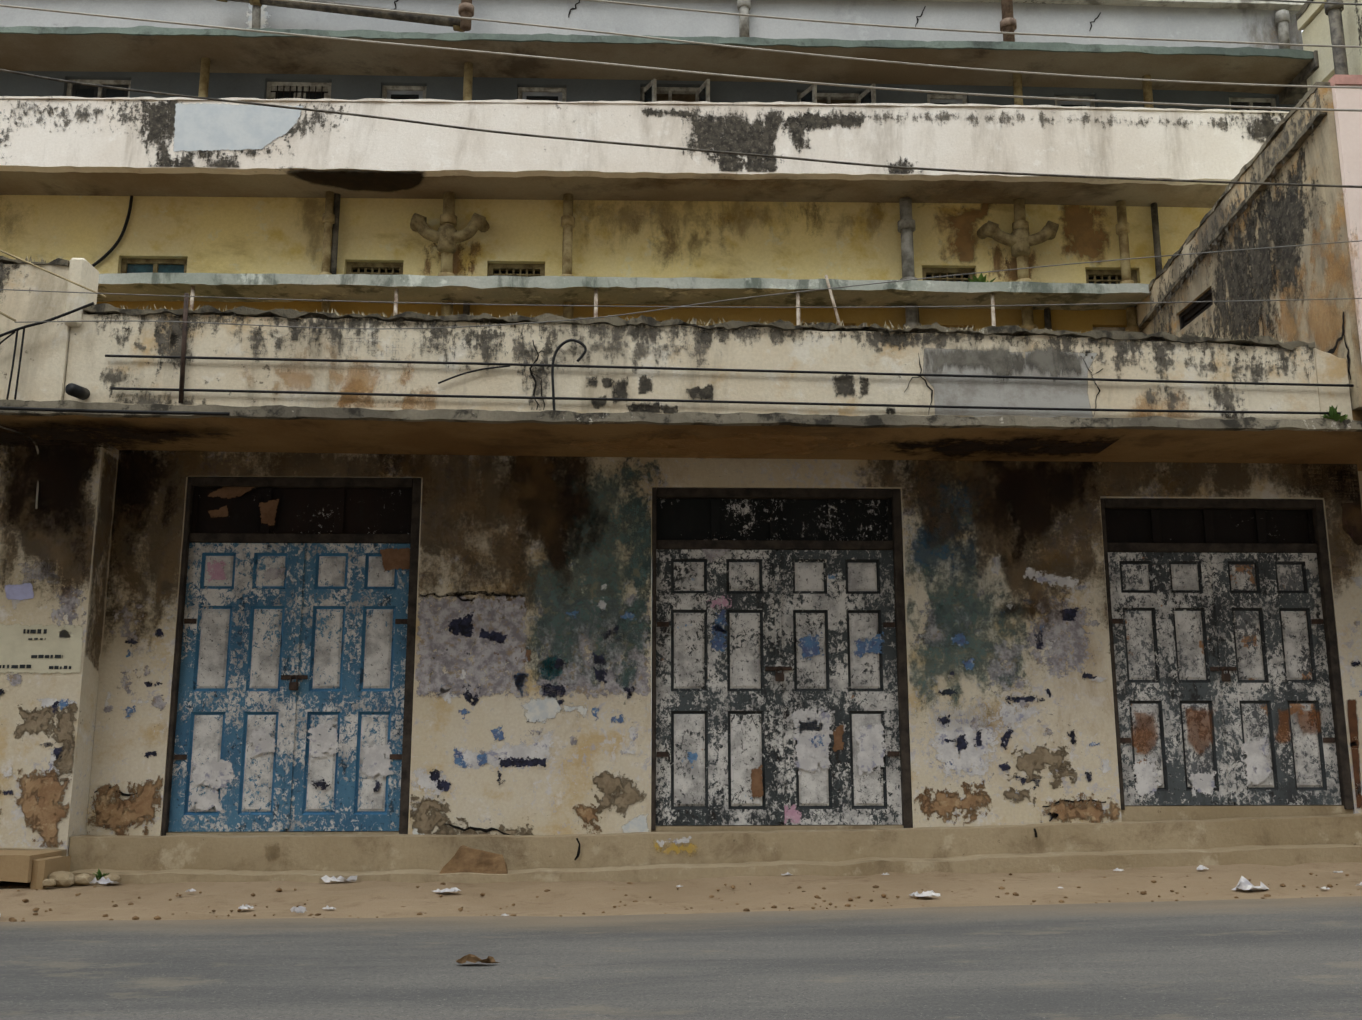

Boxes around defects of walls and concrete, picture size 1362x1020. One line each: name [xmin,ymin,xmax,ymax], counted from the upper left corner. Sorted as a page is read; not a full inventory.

water stain [245,3,271,29]
water stain [1098,0,1304,46]
water stain [0,100,272,167]
water stain [94,83,1328,419]
water stain [0,422,659,689]
water stain [860,435,1362,627]
spalling [0,702,78,847]
spalling [87,775,163,835]
spalling [572,771,647,834]
spalling [914,730,1120,825]